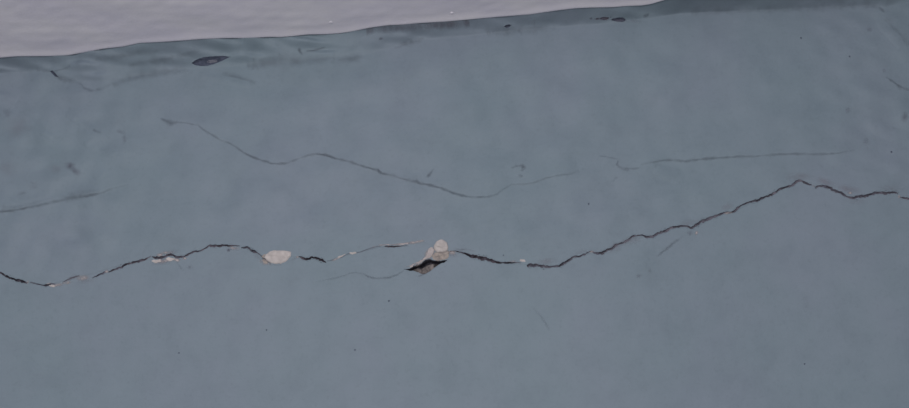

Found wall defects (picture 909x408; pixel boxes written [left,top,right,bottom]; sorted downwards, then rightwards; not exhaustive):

crack [450,179,909,269]
crack [0,243,269,288]
spalling [262,250,291,264]
crack [297,240,422,267]
spalling [404,239,454,275]